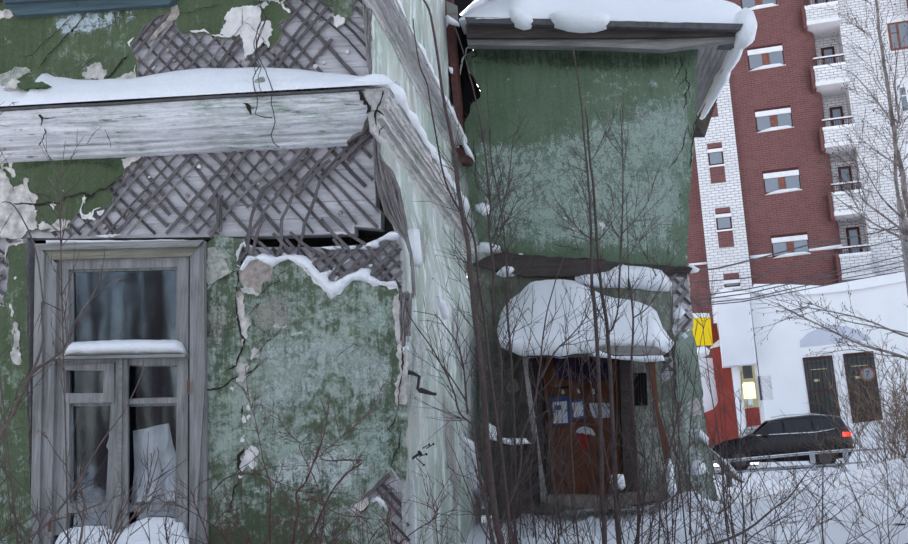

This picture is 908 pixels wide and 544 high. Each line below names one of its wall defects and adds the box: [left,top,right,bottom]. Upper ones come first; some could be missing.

crack [13,14,84,73]
spalling [82,0,370,97]
damp [469,99,689,256]
spalling [0,130,409,406]
crack [206,268,289,391]
crack [228,449,244,511]
peeling [239,404,259,478]